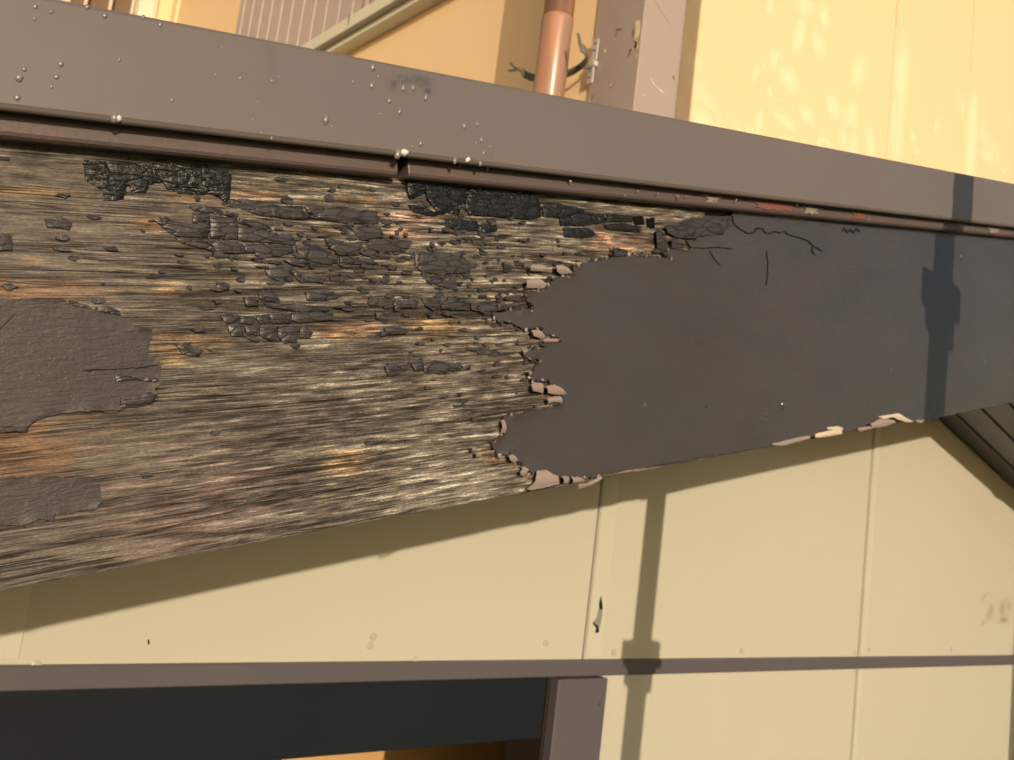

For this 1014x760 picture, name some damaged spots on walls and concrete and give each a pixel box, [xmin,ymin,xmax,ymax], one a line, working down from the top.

peeling [753,200,820,215]
crack [692,216,823,285]
peeling [0,142,732,590]
peeling [593,596,603,633]